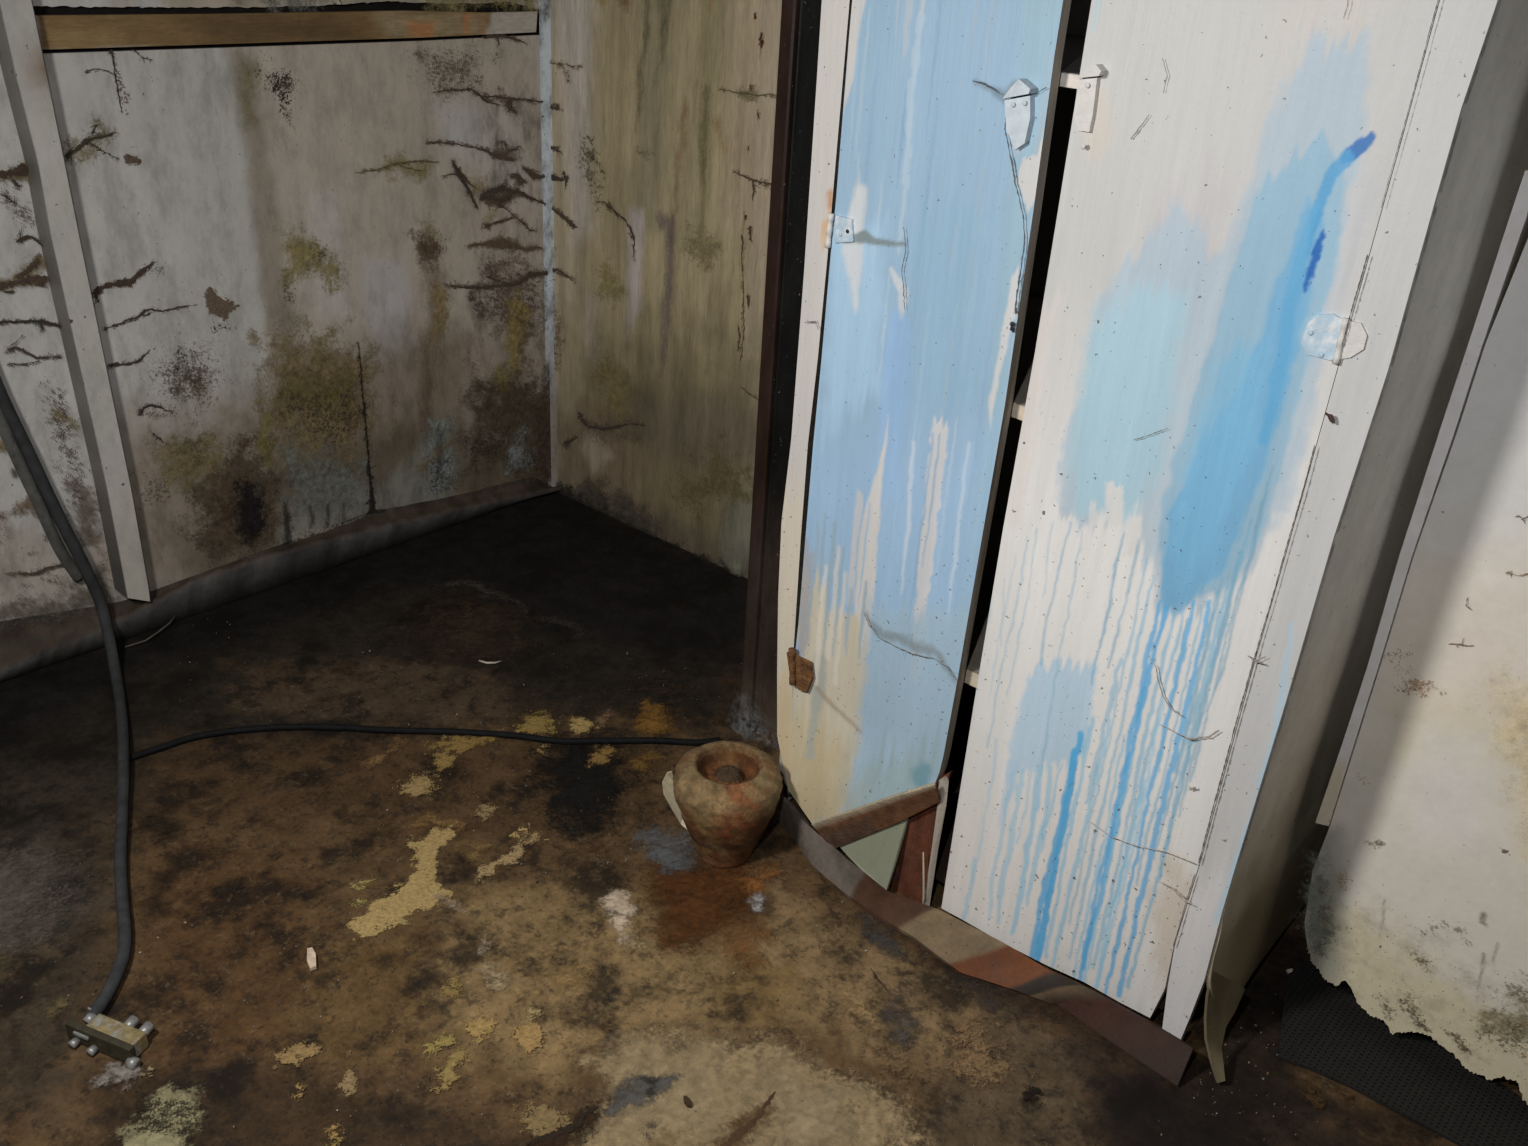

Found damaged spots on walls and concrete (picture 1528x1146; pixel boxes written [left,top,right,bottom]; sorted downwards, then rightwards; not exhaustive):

crack [63,49,152,163]
crack [355,34,635,260]
leakage [572,127,612,214]
crack [0,161,61,367]
crack [91,260,197,370]
crack [445,266,576,295]
crack [138,402,181,445]
leakage [130,231,378,560]
crack [356,341,384,515]
leakage [1375,970,1528,1058]